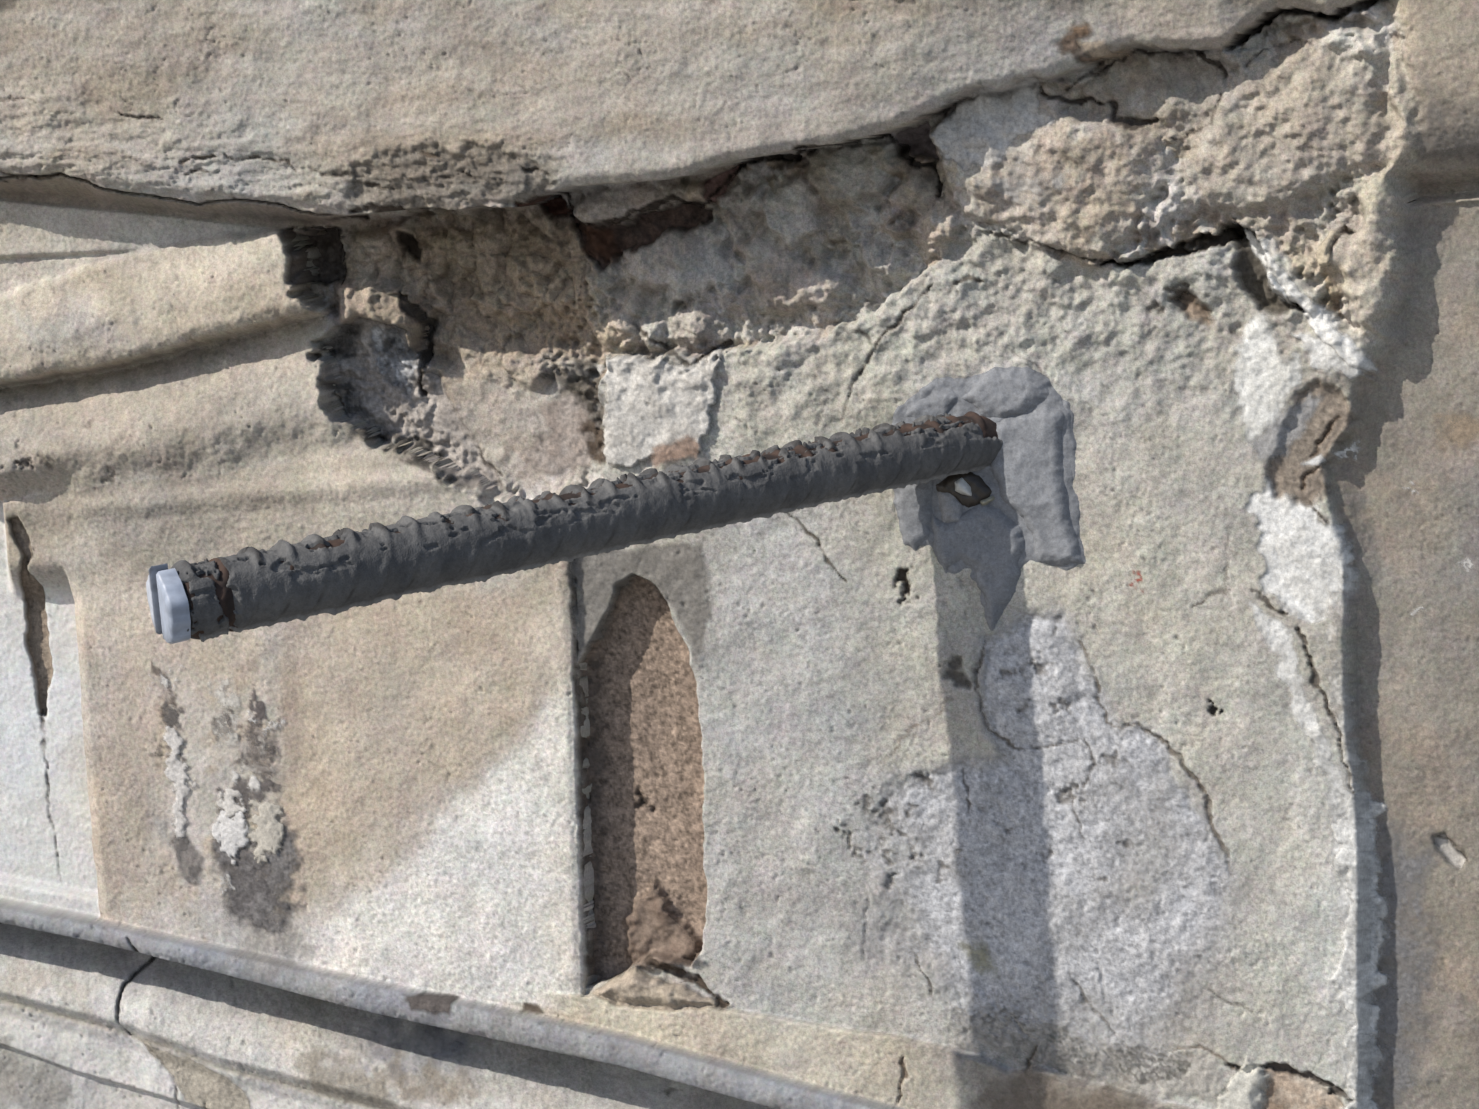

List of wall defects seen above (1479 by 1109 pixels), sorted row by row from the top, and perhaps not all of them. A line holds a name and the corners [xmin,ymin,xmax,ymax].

spalling [282,145,742,285]
crack [741,99,965,198]
spalling [929,77,1062,203]
crack [1039,0,1379,140]
spalling [321,317,502,487]
spalling [525,329,734,474]
spalling [568,544,710,983]
crack [117,946,156,1020]